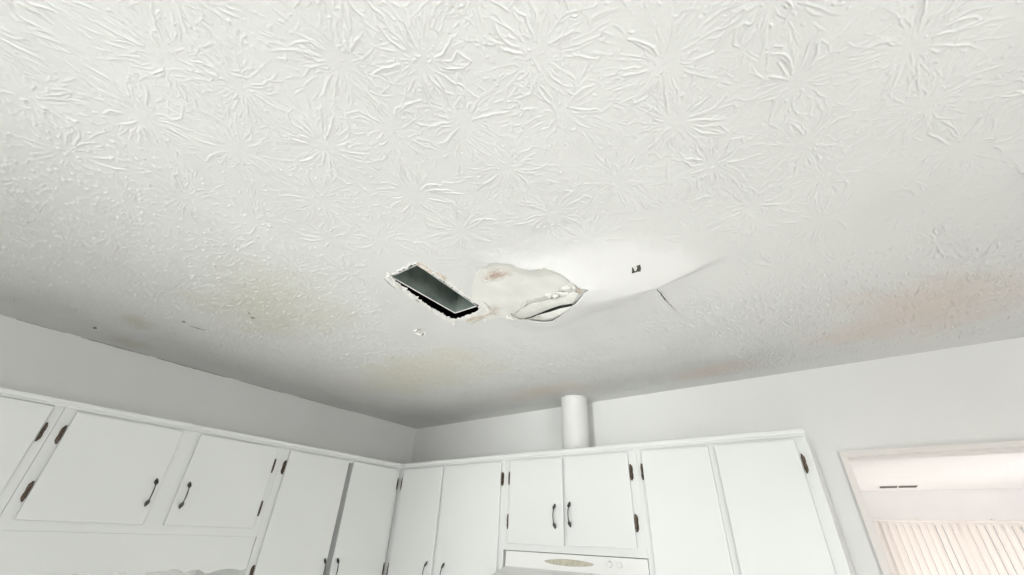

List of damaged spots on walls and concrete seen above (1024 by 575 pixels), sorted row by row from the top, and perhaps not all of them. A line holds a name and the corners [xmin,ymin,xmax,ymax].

peeling [385,262,587,326]